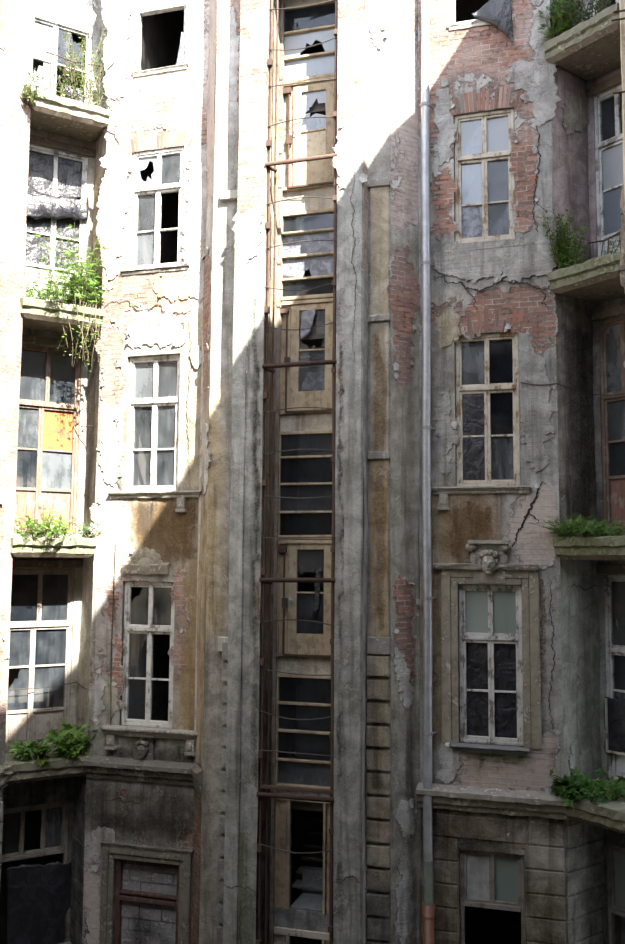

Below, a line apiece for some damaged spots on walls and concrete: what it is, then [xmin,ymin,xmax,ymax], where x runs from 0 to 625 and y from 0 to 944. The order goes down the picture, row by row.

flaking render [96,0,177,141]
peeling [93,155,212,414]
peeling [430,58,588,571]
peeling [200,422,210,495]
water stain [136,504,195,556]
crack [512,481,543,546]
peeling [395,798,419,837]
flaking render [84,826,115,944]
peeling [394,855,414,944]